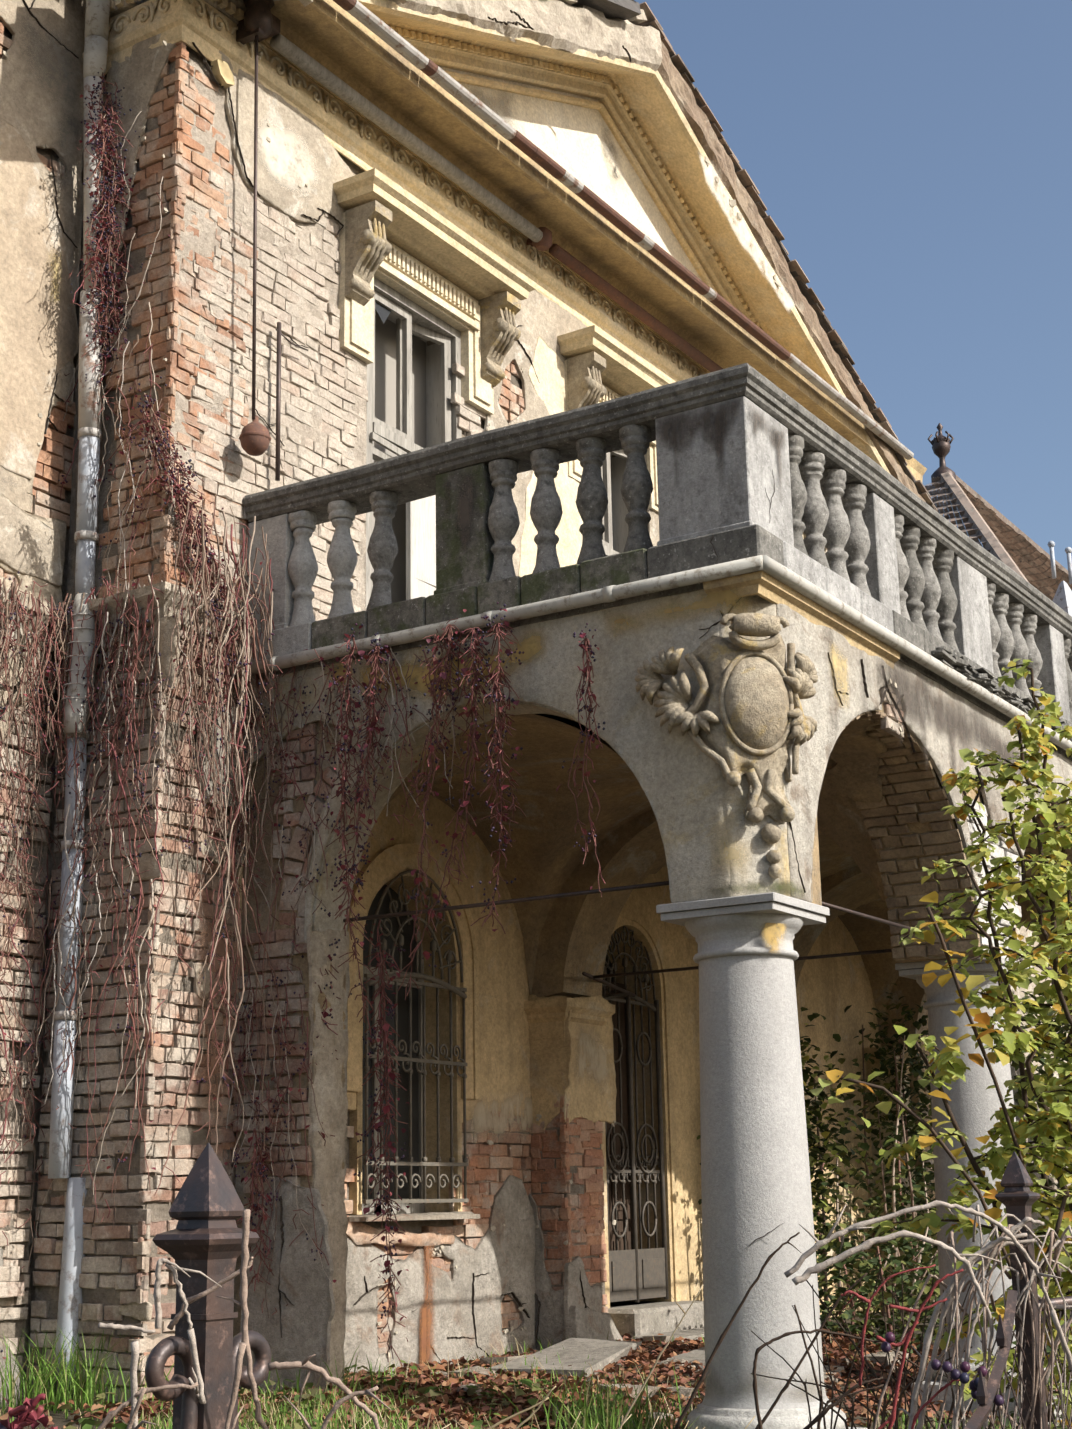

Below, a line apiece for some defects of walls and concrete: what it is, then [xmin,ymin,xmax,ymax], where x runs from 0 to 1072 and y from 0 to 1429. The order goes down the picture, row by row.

spalling [0,22,12,58]
crack [22,0,80,59]
crack [488,10,534,30]
peeling [259,123,314,192]
crack [50,155,78,248]
spalling [98,41,258,603]
spalling [31,397,76,529]
spalling [879,679,904,738]
spalling [453,1132,527,1231]
crack [354,1276,388,1305]
spalling [431,1245,458,1279]
crack [432,1273,541,1361]